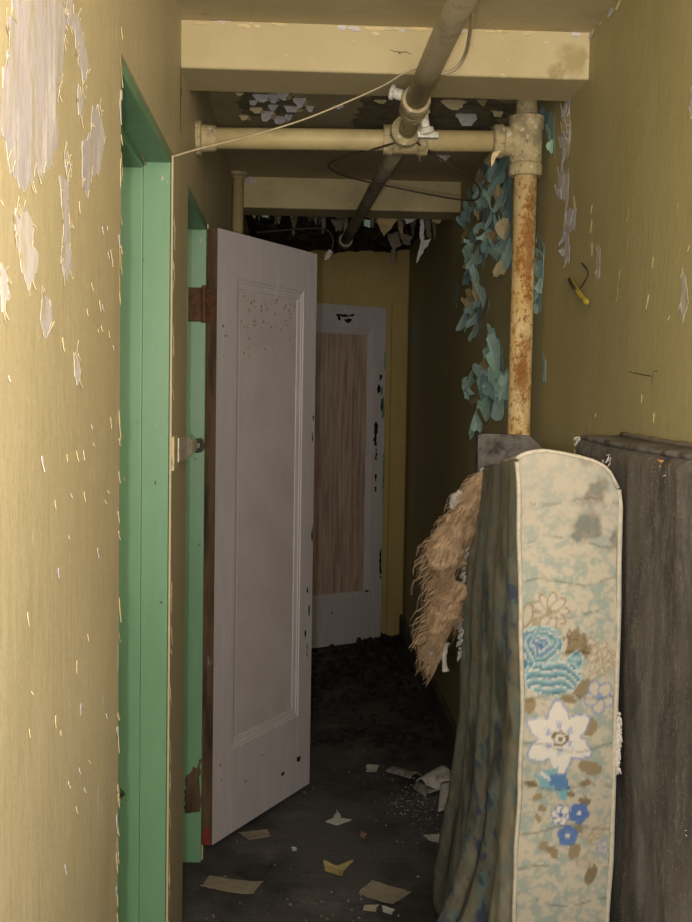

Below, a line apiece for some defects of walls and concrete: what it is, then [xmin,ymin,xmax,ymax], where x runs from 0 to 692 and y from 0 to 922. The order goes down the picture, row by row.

peeling [235,92,315,124]
peeling [0,0,106,388]
peeling [108,216,123,305]
peeling [454,150,513,439]
peeling [533,232,545,314]
corrosion [514,336,530,405]